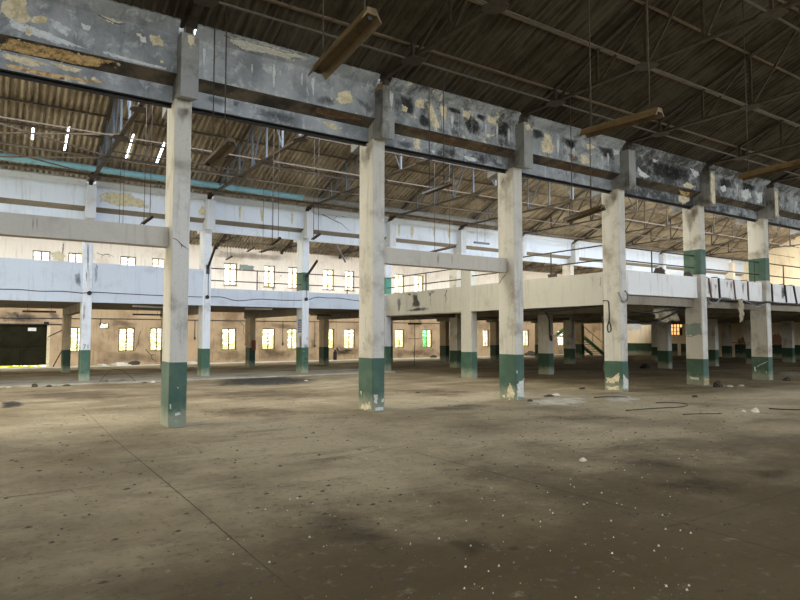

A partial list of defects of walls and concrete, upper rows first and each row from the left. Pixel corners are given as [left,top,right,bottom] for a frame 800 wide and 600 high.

spalling [0,0,121,85]
peeling [330,89,353,105]
damp [390,94,429,127]
peeling [402,97,447,130]
damp [450,108,511,140]
peeling [541,132,554,157]
spalling [678,182,696,204]
peeling [503,370,525,400]
peeling [606,373,629,391]
peeling [360,395,384,411]